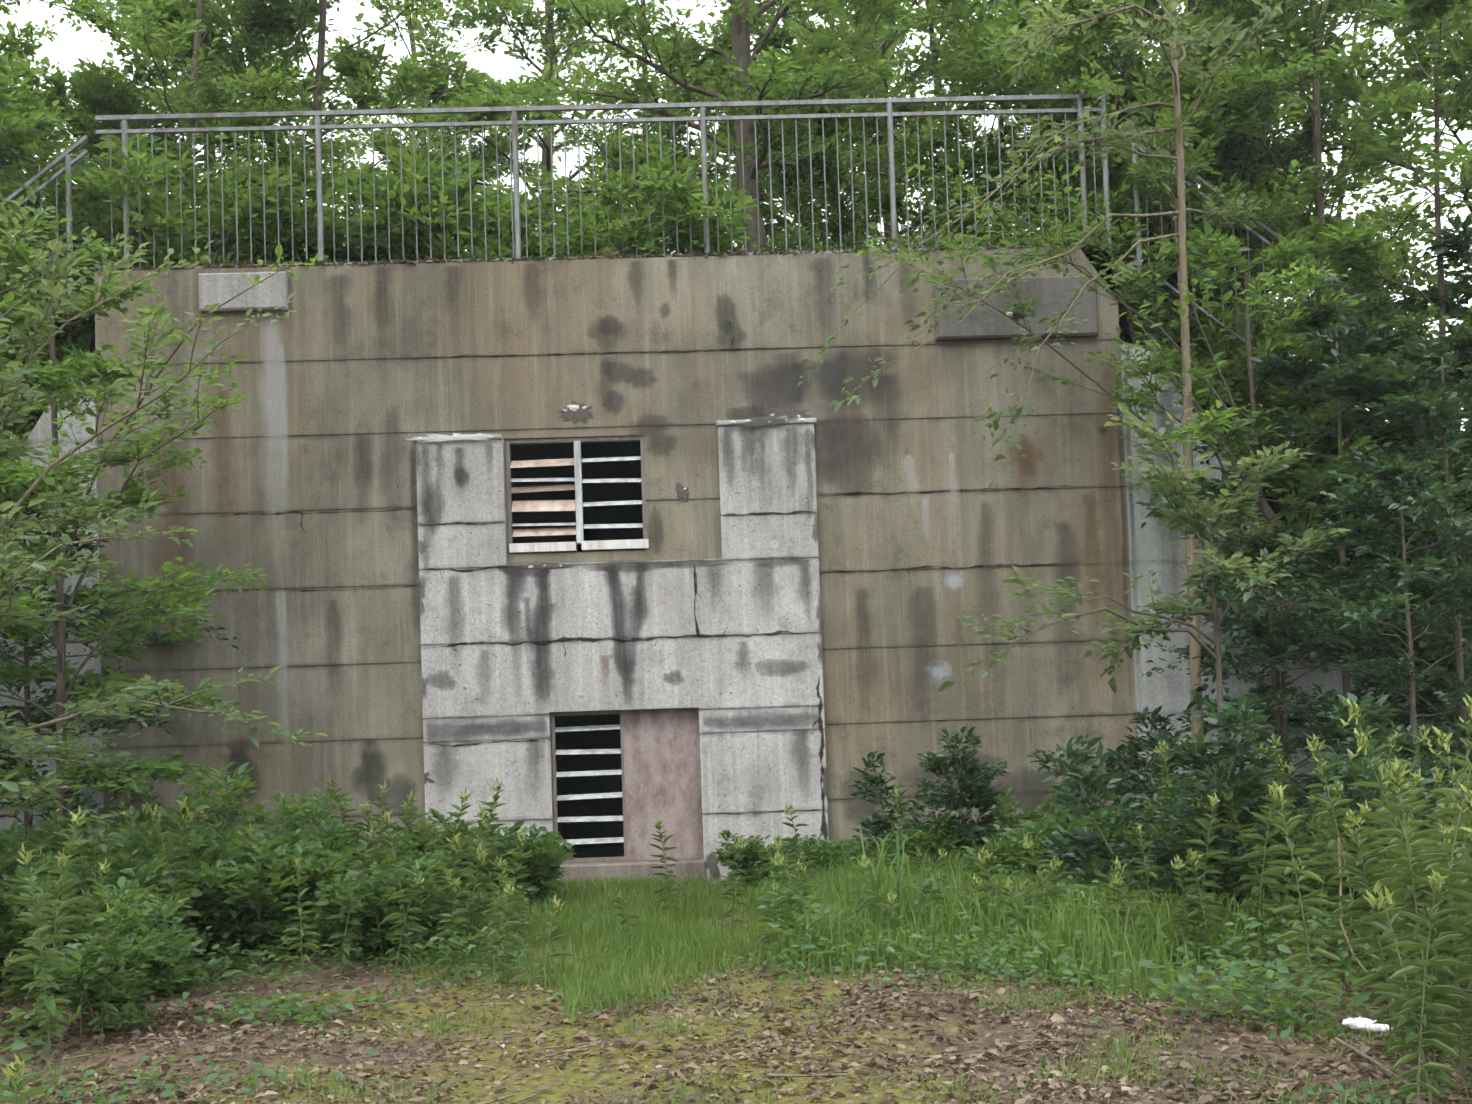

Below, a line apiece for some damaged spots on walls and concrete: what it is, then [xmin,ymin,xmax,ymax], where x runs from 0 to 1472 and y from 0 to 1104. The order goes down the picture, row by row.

spalling [560,402,592,423]
damp [505,564,550,695]
crack [423,564,816,657]